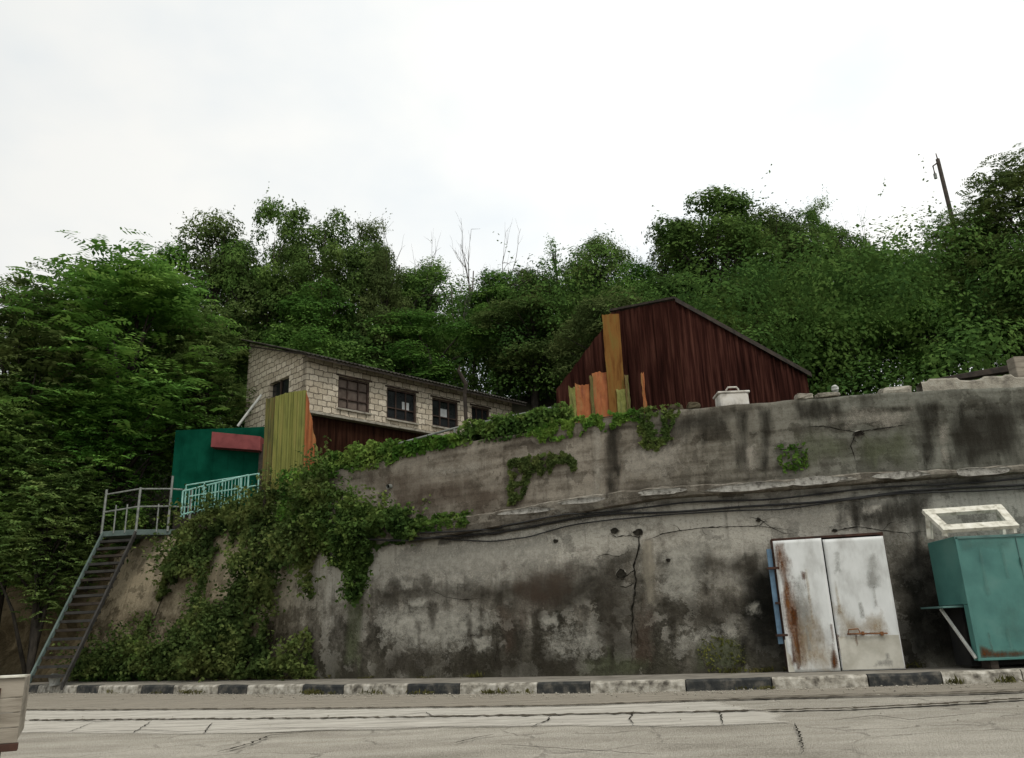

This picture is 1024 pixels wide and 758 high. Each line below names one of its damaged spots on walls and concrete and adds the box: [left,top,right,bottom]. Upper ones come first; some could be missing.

water stain [742,411,770,468]
crack [811,423,915,459]
water stain [918,403,1022,470]
crack [598,517,802,662]
corrosion [777,546,805,669]